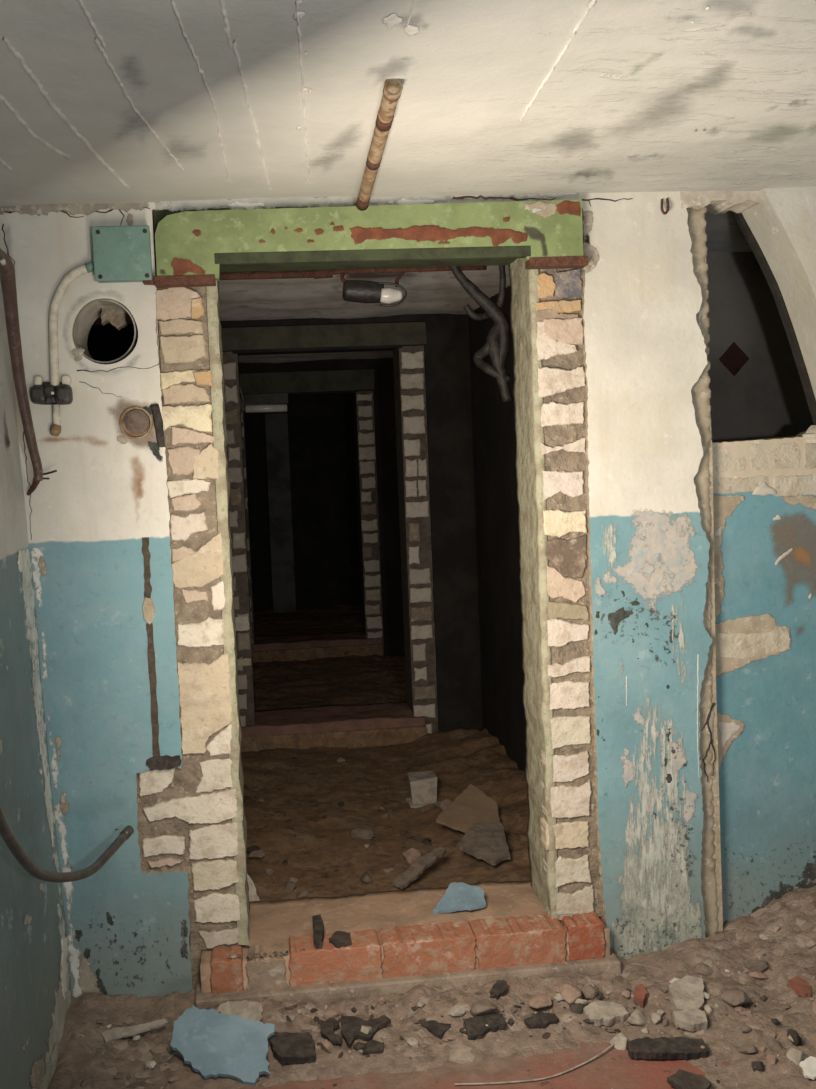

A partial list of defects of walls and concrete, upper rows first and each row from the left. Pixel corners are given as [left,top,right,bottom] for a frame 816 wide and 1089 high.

rust [259,217,547,256]
flaking render [582,211,599,273]
peeling [594,207,816,959]
rust [773,515,816,601]
crack [701,702,716,782]
peeling [18,547,173,1089]
peeling [180,920,189,959]